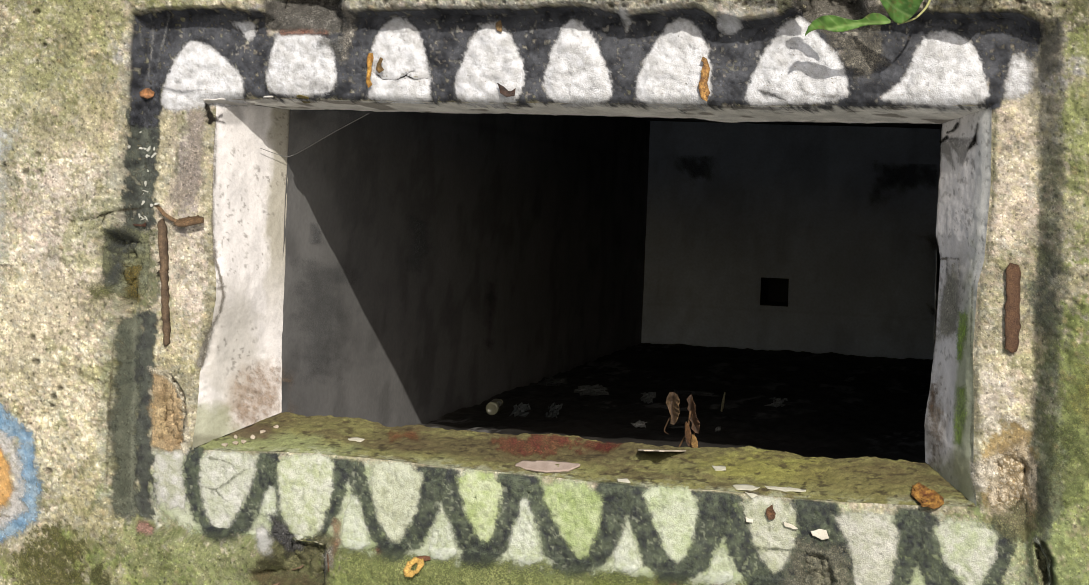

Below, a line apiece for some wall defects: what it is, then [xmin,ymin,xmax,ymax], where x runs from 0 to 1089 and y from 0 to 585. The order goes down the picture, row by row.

spalling [264,0,356,60]
spalling [793,0,886,75]
rust [156,219,171,347]
rust [1004,263,1021,353]
spalling [150,368,191,453]
leakage [1035,421,1085,526]